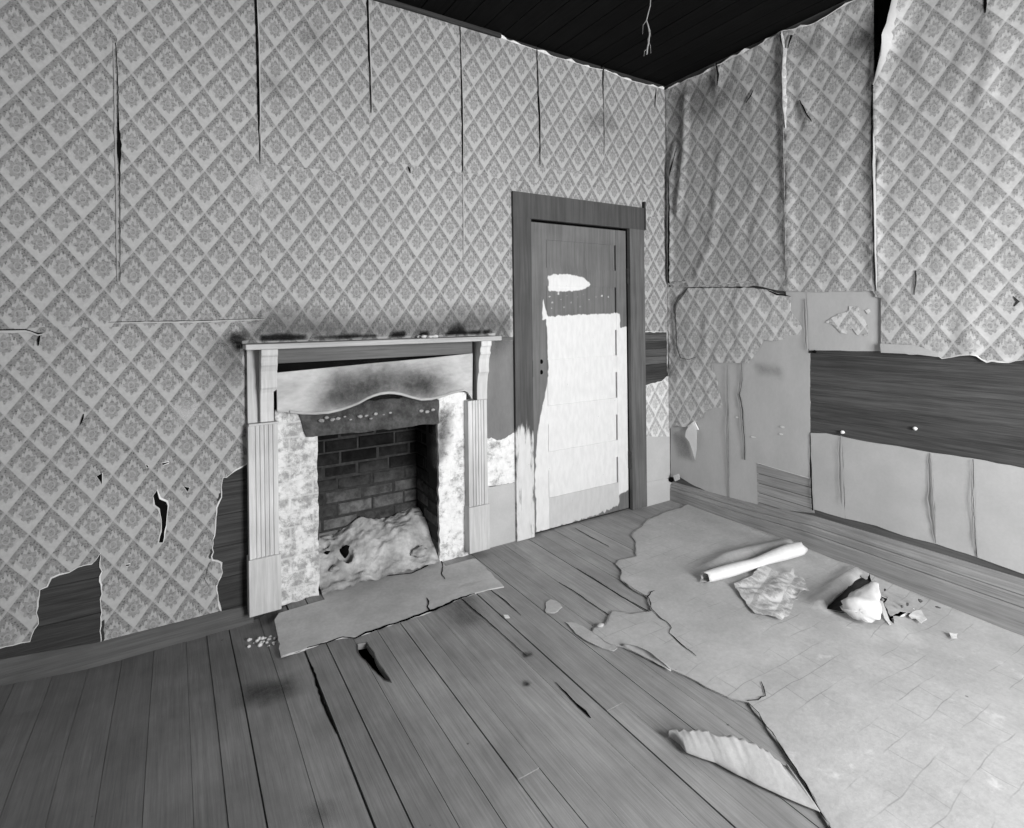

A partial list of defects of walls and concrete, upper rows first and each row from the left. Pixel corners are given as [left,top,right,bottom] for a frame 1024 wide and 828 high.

crack [254,0,262,160]
crack [365,0,373,103]
crack [458,32,466,172]
crack [113,43,122,281]
peeling [808,349,1024,468]
peeling [205,463,248,611]
peeling [757,463,815,513]
peeling [0,553,105,659]
crack [296,561,482,653]
crack [624,582,695,655]